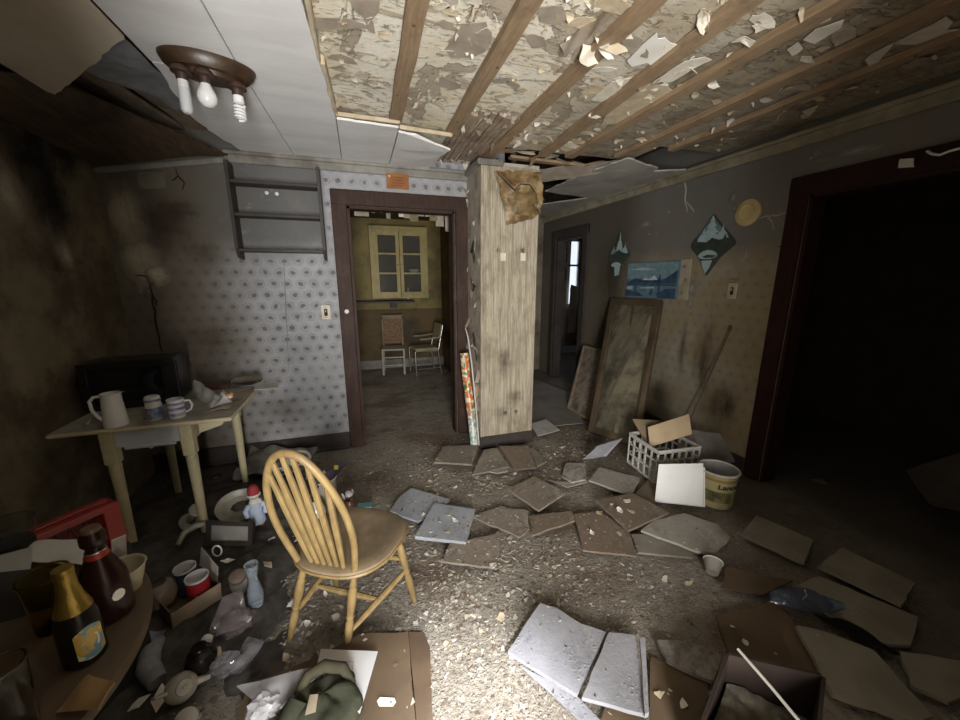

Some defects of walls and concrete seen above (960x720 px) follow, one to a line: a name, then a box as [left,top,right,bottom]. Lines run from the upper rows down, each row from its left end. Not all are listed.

peeling [314,0,389,42]
peeling [423,0,499,59]
peeling [726,12,776,57]
peeling [774,18,868,63]
peeling [865,17,960,66]
peeling [327,54,382,88]
peeling [412,77,461,110]
peeling [437,0,726,171]
peeling [751,83,828,119]
peeling [710,111,737,151]